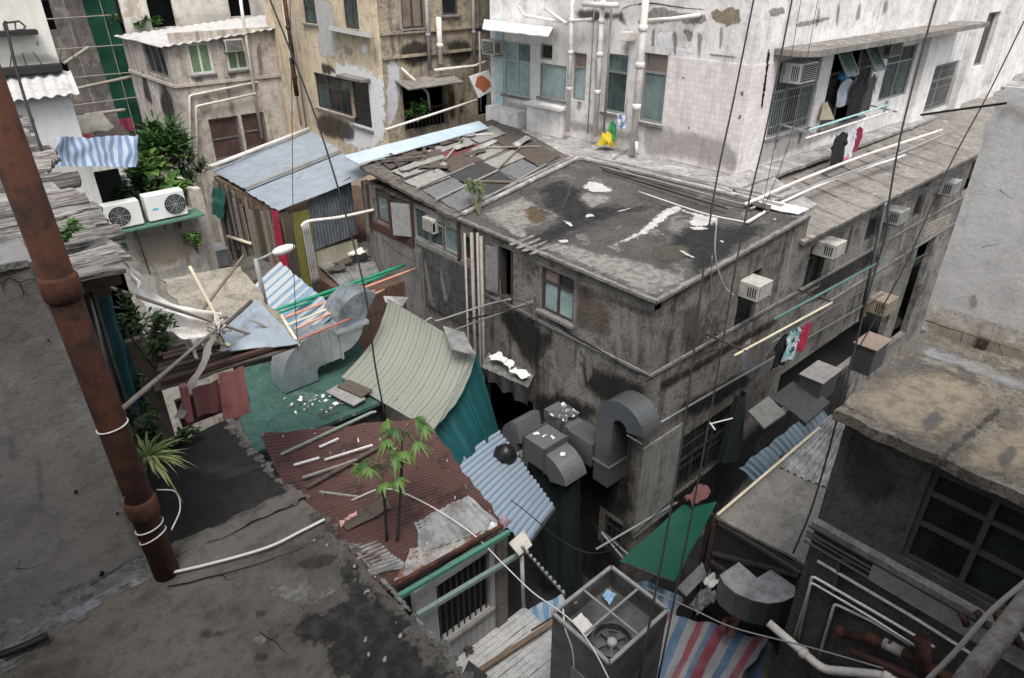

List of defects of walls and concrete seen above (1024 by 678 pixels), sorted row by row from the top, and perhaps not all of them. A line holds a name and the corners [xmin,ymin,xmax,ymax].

peeling [648,7,741,54]
peeling [330,44,401,151]
damp [611,206,761,272]
damp [501,311,552,363]
damp [584,368,643,399]